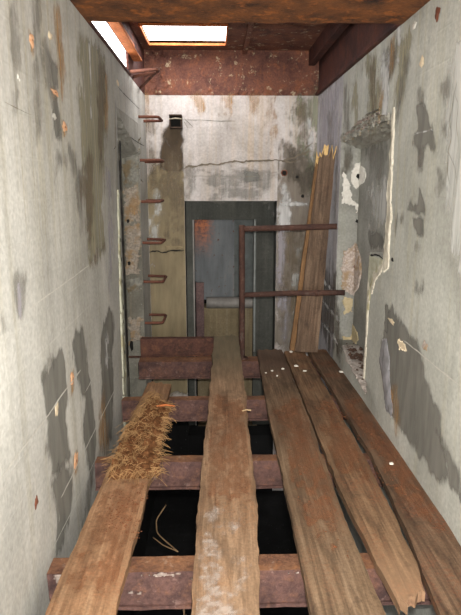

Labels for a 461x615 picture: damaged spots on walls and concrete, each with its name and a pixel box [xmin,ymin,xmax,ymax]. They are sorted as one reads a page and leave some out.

damp [80,64,108,235]
crack [149,245,184,253]
damp [147,126,187,337]
crack [184,143,312,177]
flaking render [340,107,396,379]
damp [414,94,435,169]
damp [41,349,73,555]
damp [73,327,96,483]
damp [101,307,114,442]
damp [383,305,461,502]